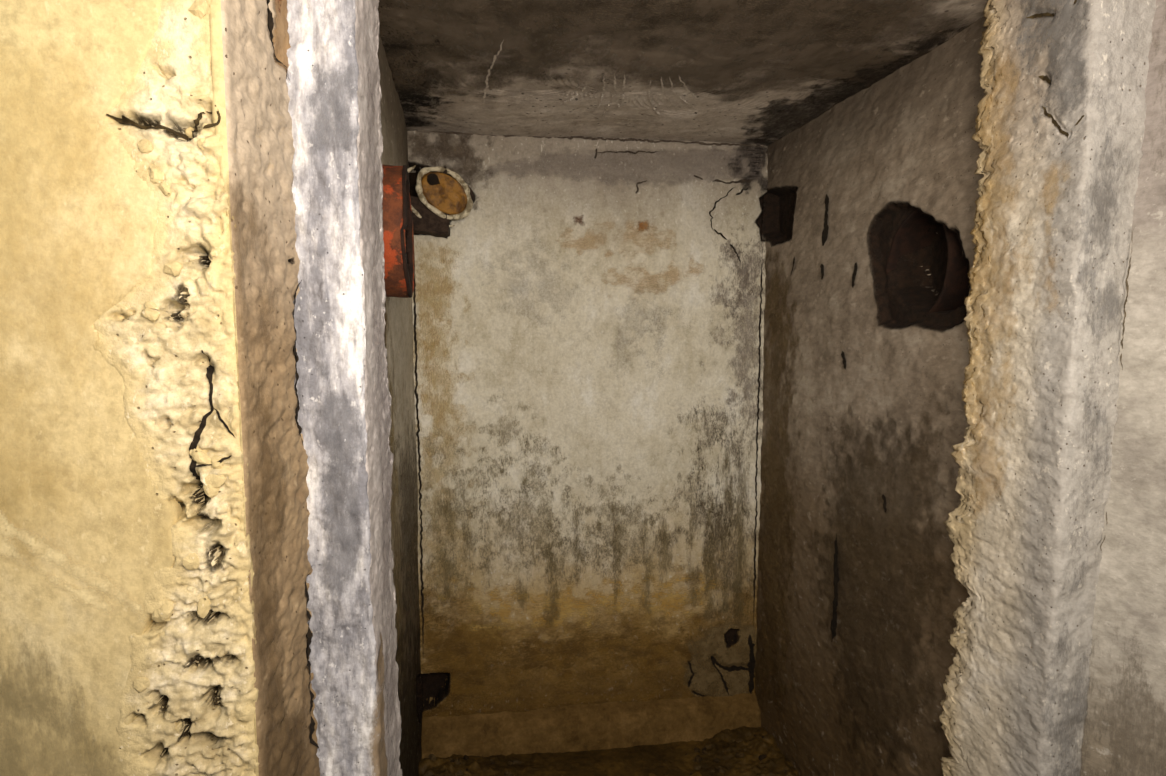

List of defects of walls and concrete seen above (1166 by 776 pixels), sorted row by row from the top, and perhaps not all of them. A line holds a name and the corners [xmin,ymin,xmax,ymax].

crack [267,0,290,80]
water stain [381,0,603,131]
crack [416,131,763,158]
water stain [728,27,965,190]
crack [791,194,829,279]
crack [850,263,858,288]
spalling [93,0,259,776]
crack [293,280,303,444]
water stain [390,241,798,776]
crack [688,175,763,697]
crack [839,351,847,369]
crack [305,566,320,752]